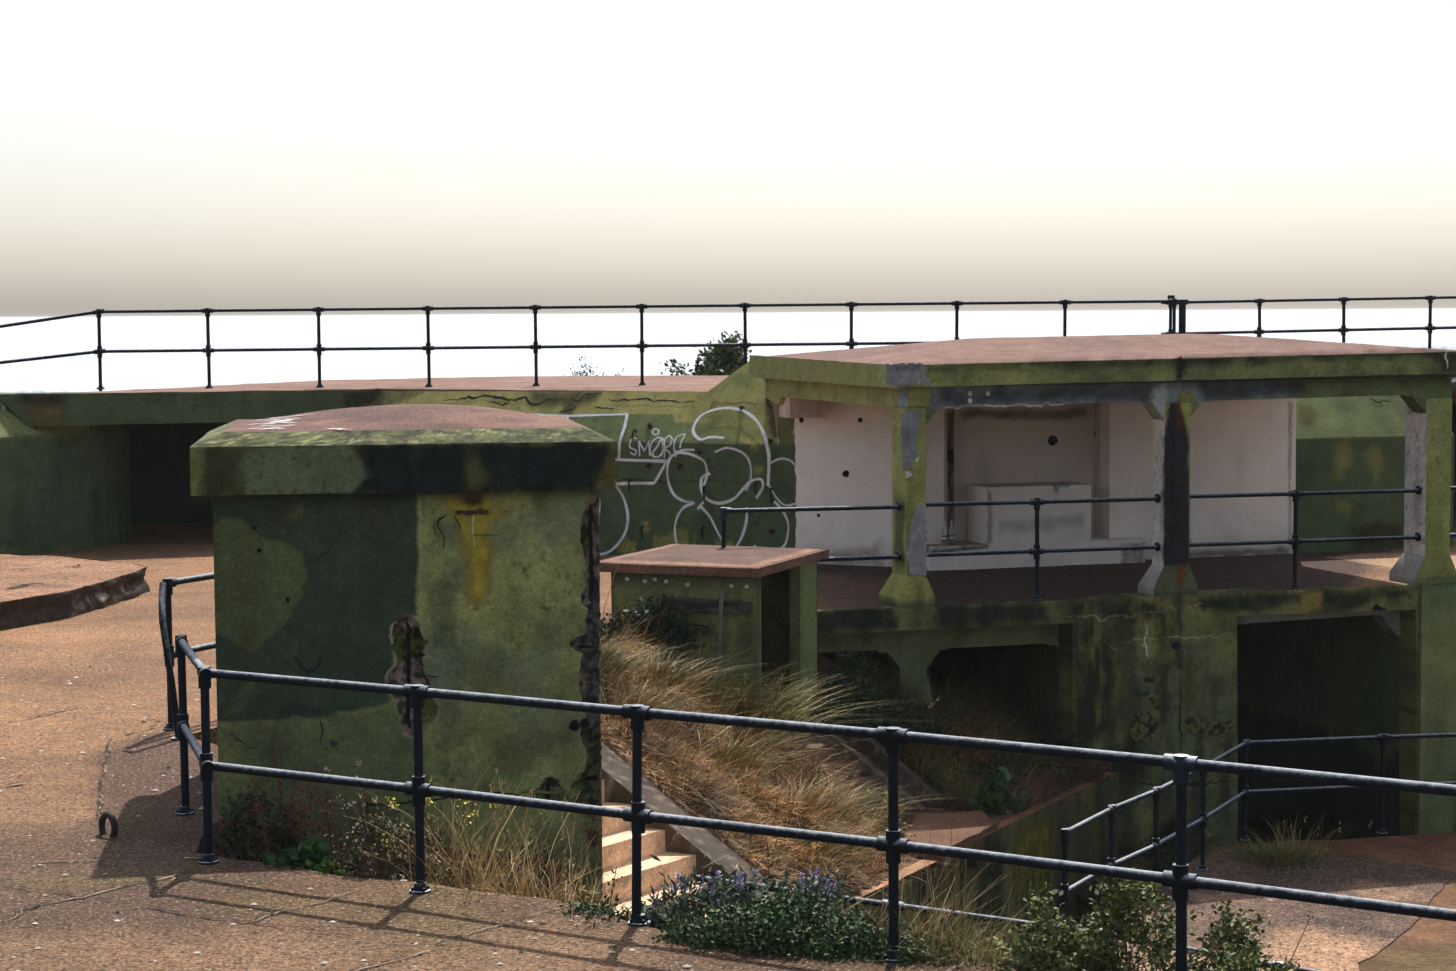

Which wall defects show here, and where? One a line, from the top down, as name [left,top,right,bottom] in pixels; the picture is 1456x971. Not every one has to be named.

crack [443,379,774,415]
peeling [900,410,922,478]
peeling [906,505,928,576]
crack [1069,603,1237,651]
spalling [384,614,438,738]
spalling [530,495,602,848]
crack [1125,675,1237,787]